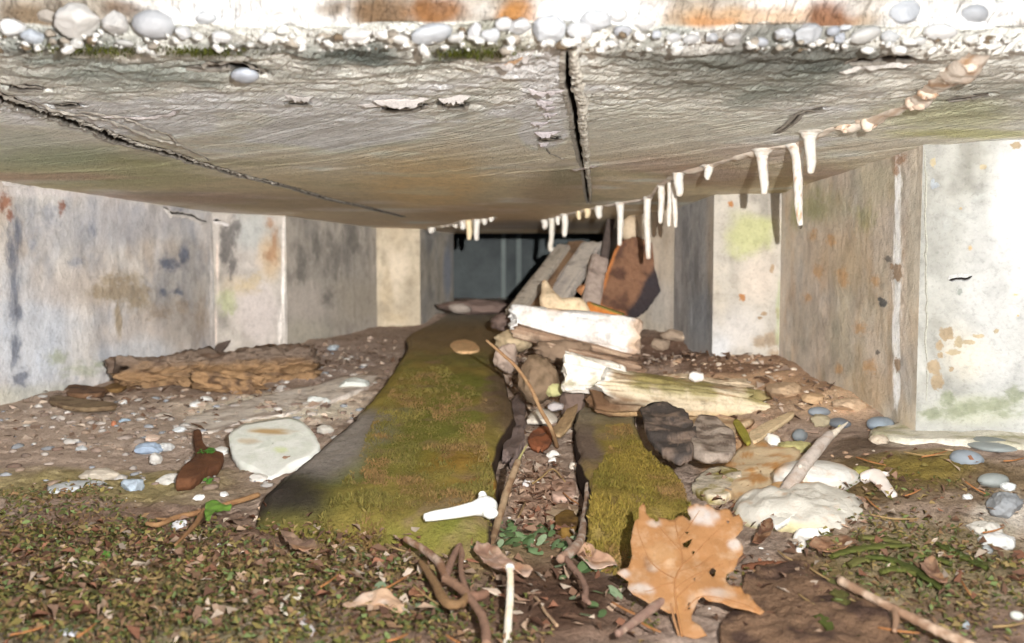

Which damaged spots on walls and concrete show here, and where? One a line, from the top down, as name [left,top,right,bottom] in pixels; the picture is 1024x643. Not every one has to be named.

crack [163,206,229,227]
crack [0,92,406,217]
peeling [358,95,471,113]
peeling [528,89,565,160]
crack [558,48,598,203]
damp [541,151,755,222]
damp [769,50,993,150]
damp [0,187,367,399]